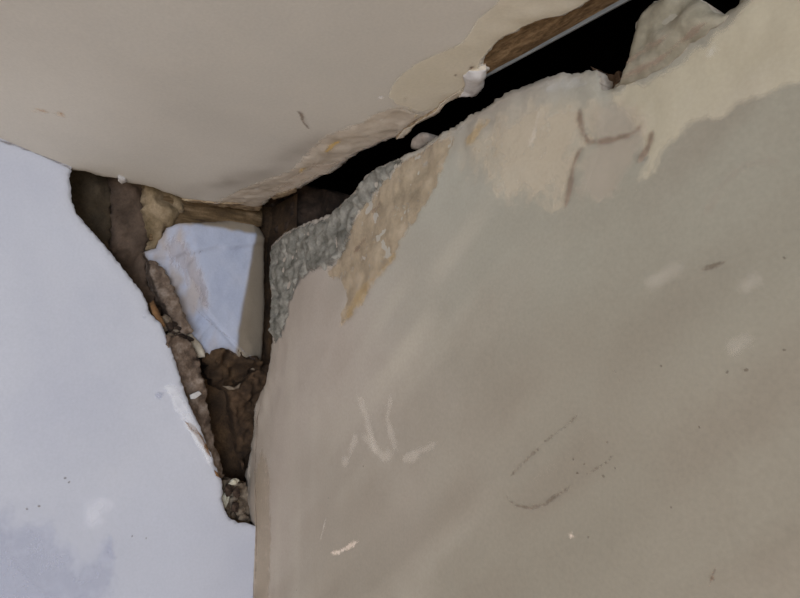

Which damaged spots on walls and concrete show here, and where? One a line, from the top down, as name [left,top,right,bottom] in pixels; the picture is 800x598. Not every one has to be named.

peeling [616,0,729,87]
spalling [69,88,464,524]